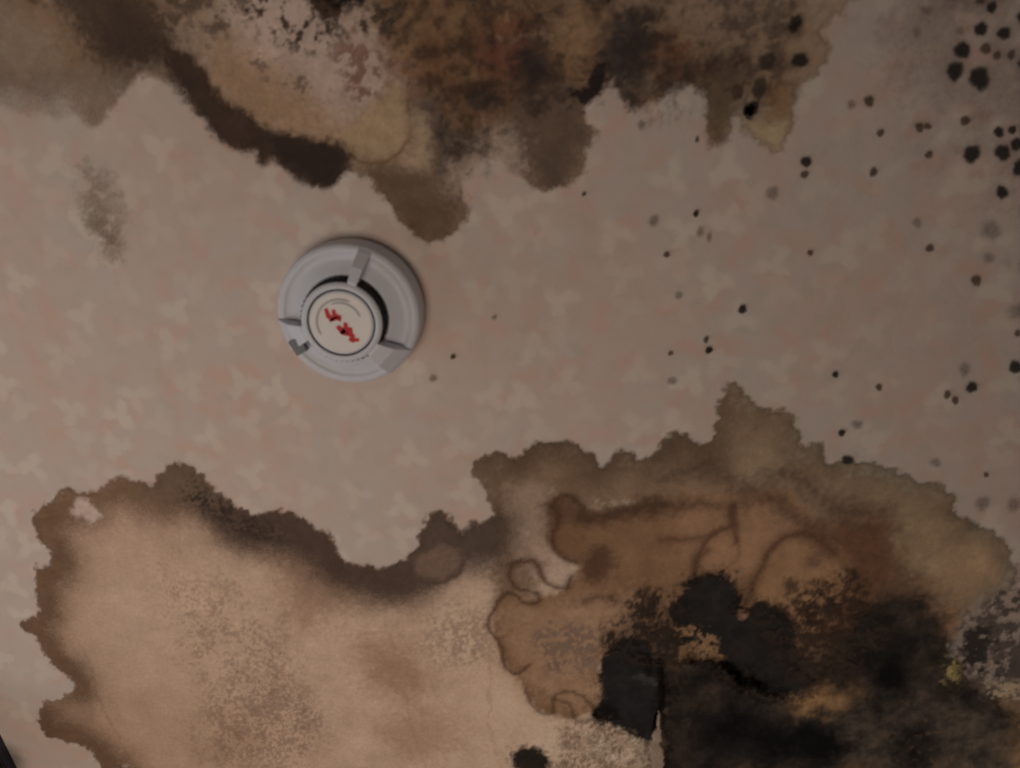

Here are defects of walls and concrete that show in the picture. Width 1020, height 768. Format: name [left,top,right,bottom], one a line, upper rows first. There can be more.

water stain [947,0,1020,92]
water stain [0,0,847,245]
water stain [963,146,980,164]
water stain [994,126,1020,176]
water stain [997,186,1009,199]
water stain [944,368,977,405]
water stain [1009,361,1020,374]
water stain [20,382,1020,768]